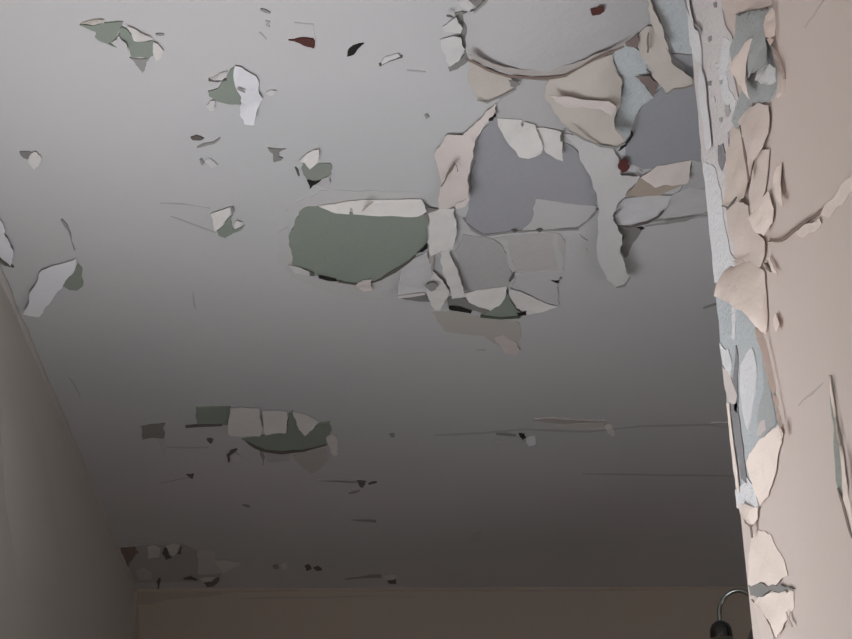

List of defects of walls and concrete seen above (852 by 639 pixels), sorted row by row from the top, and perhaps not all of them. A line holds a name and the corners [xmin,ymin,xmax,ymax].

flaking render [80,19,164,61]
peeling [206,66,277,125]
peeling [0,220,14,268]
peeling [23,258,84,317]
flaking render [288,0,795,637]
peeling [141,423,165,440]
flaking render [196,405,339,462]
peeling [829,375,852,529]
peeling [121,547,139,566]